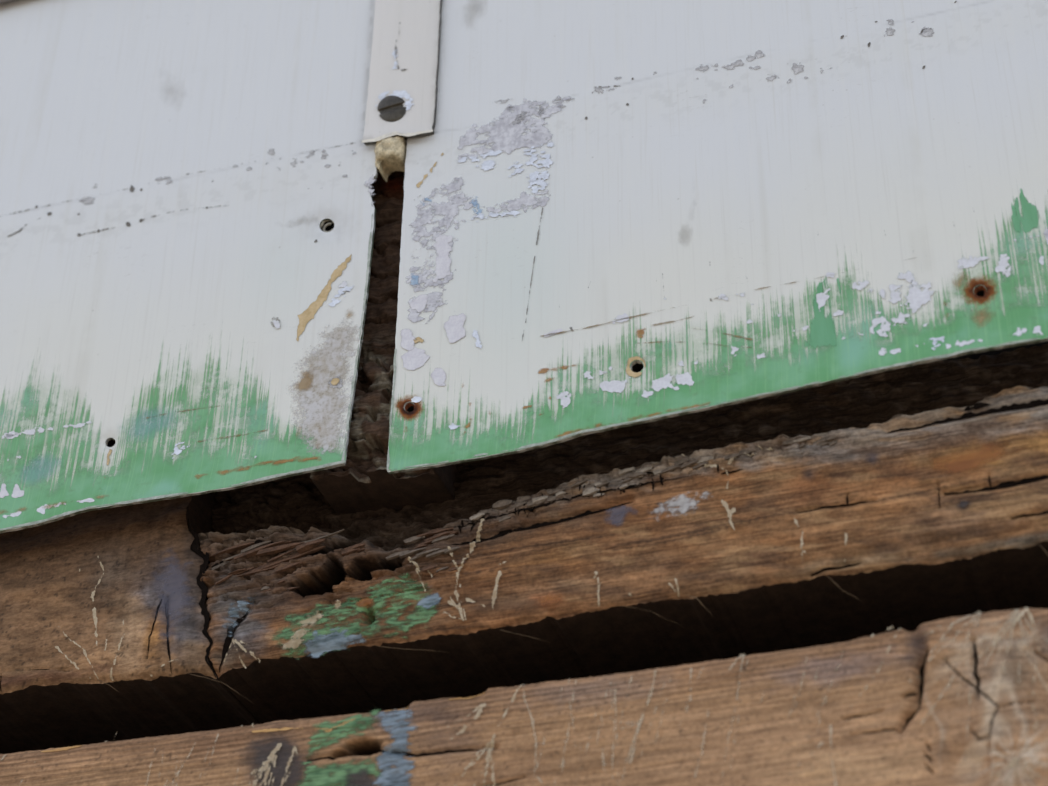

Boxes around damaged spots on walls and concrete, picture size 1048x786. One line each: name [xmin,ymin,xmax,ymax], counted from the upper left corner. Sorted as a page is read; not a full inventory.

peeling [696,50,807,83]
peeling [387,96,1048,471]
rust [958,277,996,323]
peeling [0,214,373,531]
damp [299,373,311,389]
rust [396,396,422,419]
crack [799,496,871,513]
crack [938,475,1048,507]
crack [811,563,860,576]
crack [147,600,172,673]
crack [219,611,249,673]
crack [845,642,1032,768]